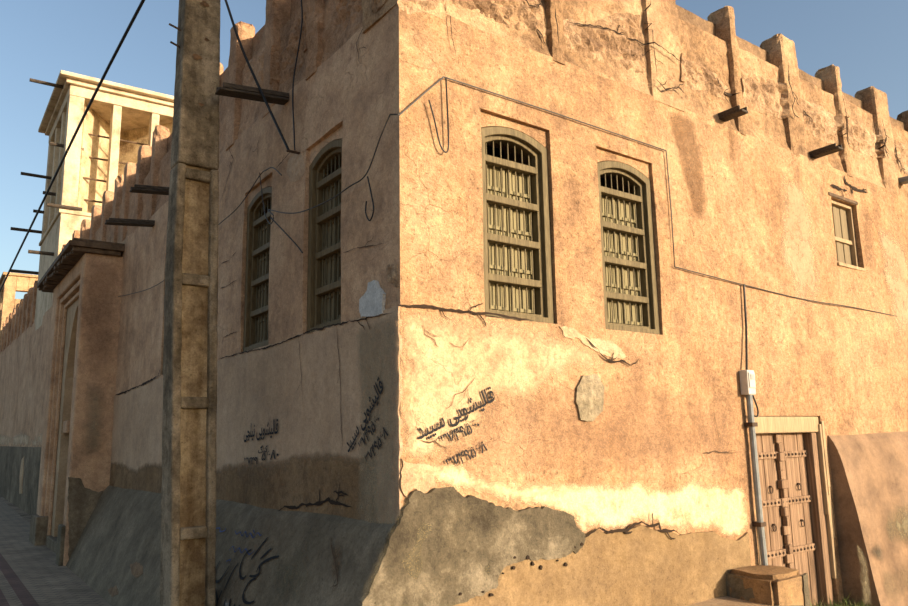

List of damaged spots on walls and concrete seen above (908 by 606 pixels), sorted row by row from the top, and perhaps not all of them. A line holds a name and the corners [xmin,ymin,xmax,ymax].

spalling [368,0,552,39]
spalling [563,13,646,74]
spalling [559,326,628,359]
crack [219,303,533,434]
damp [110,463,162,493]
damp [216,455,376,522]
crack [278,483,351,511]
flaking render [399,459,751,606]
crack [586,513,682,540]